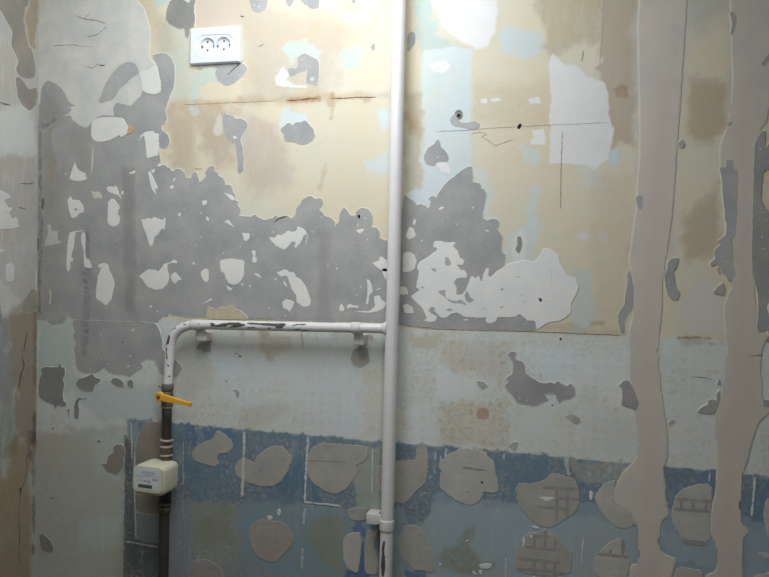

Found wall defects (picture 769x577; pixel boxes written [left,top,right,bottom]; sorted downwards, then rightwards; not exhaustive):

rust [167,86,391,122]
peeling [38,53,388,419]
peeling [399,166,537,332]
peeling [751,130,769,343]
crack [18,332,28,390]
peeling [101,421,163,475]
peeling [134,491,159,515]